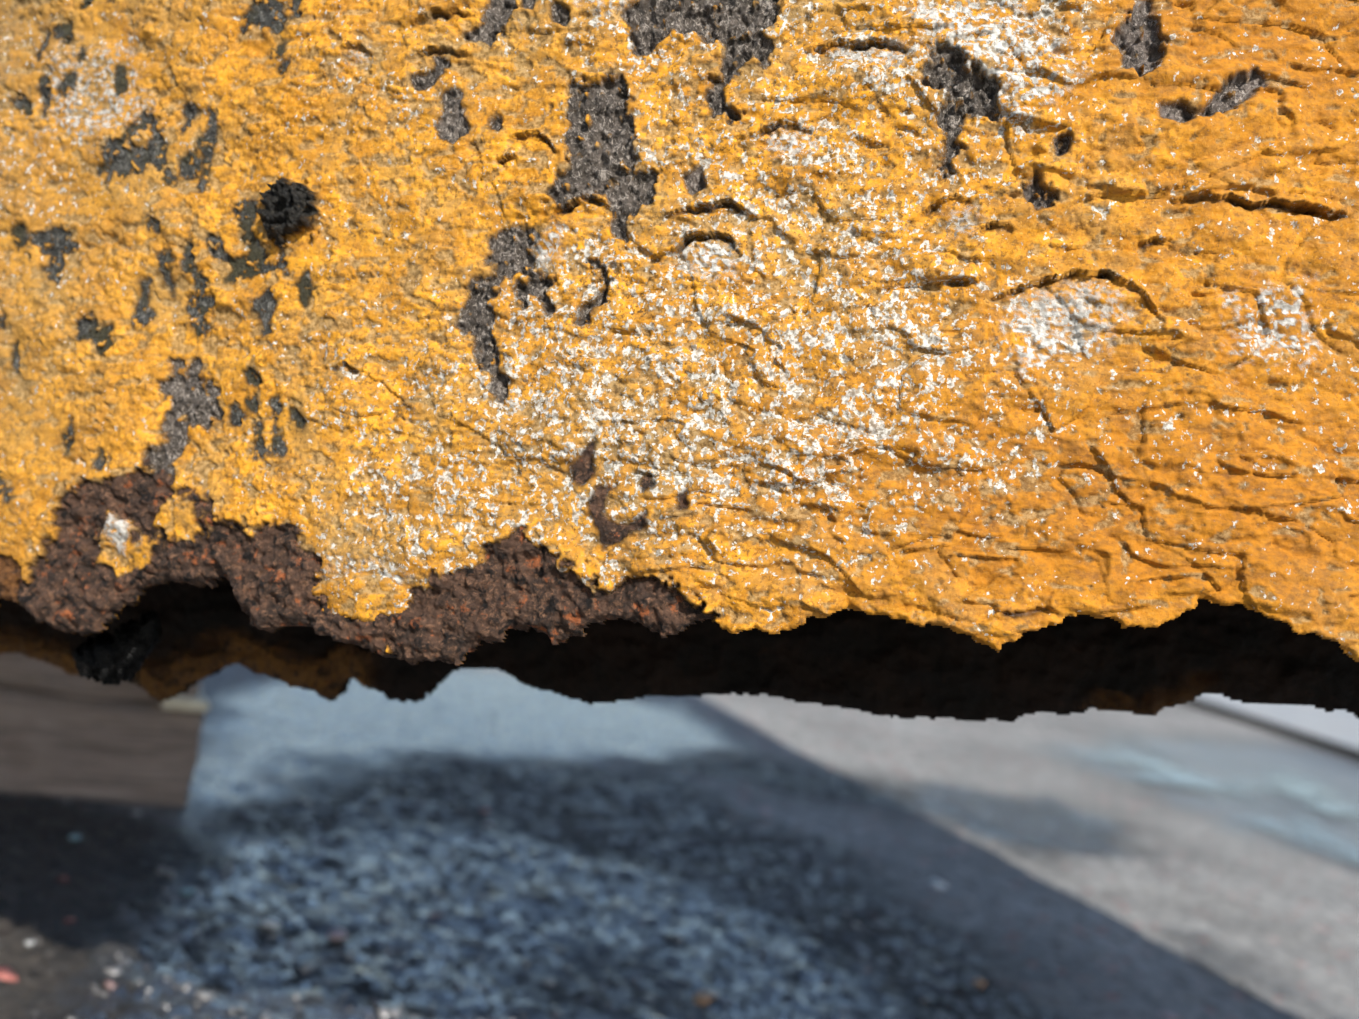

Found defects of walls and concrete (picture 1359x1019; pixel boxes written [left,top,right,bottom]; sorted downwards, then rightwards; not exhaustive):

peeling [98,102,218,193]
peeling [240,0,302,74]
peeling [465,0,535,47]
peeling [547,72,658,243]
peeling [621,0,779,125]
peeling [921,46,1000,179]
peeling [76,311,114,355]
peeling [131,176,320,337]
peeling [455,227,559,404]
peeling [143,359,305,479]
corrosion [570,441,648,549]
corrosion [0,458,720,702]